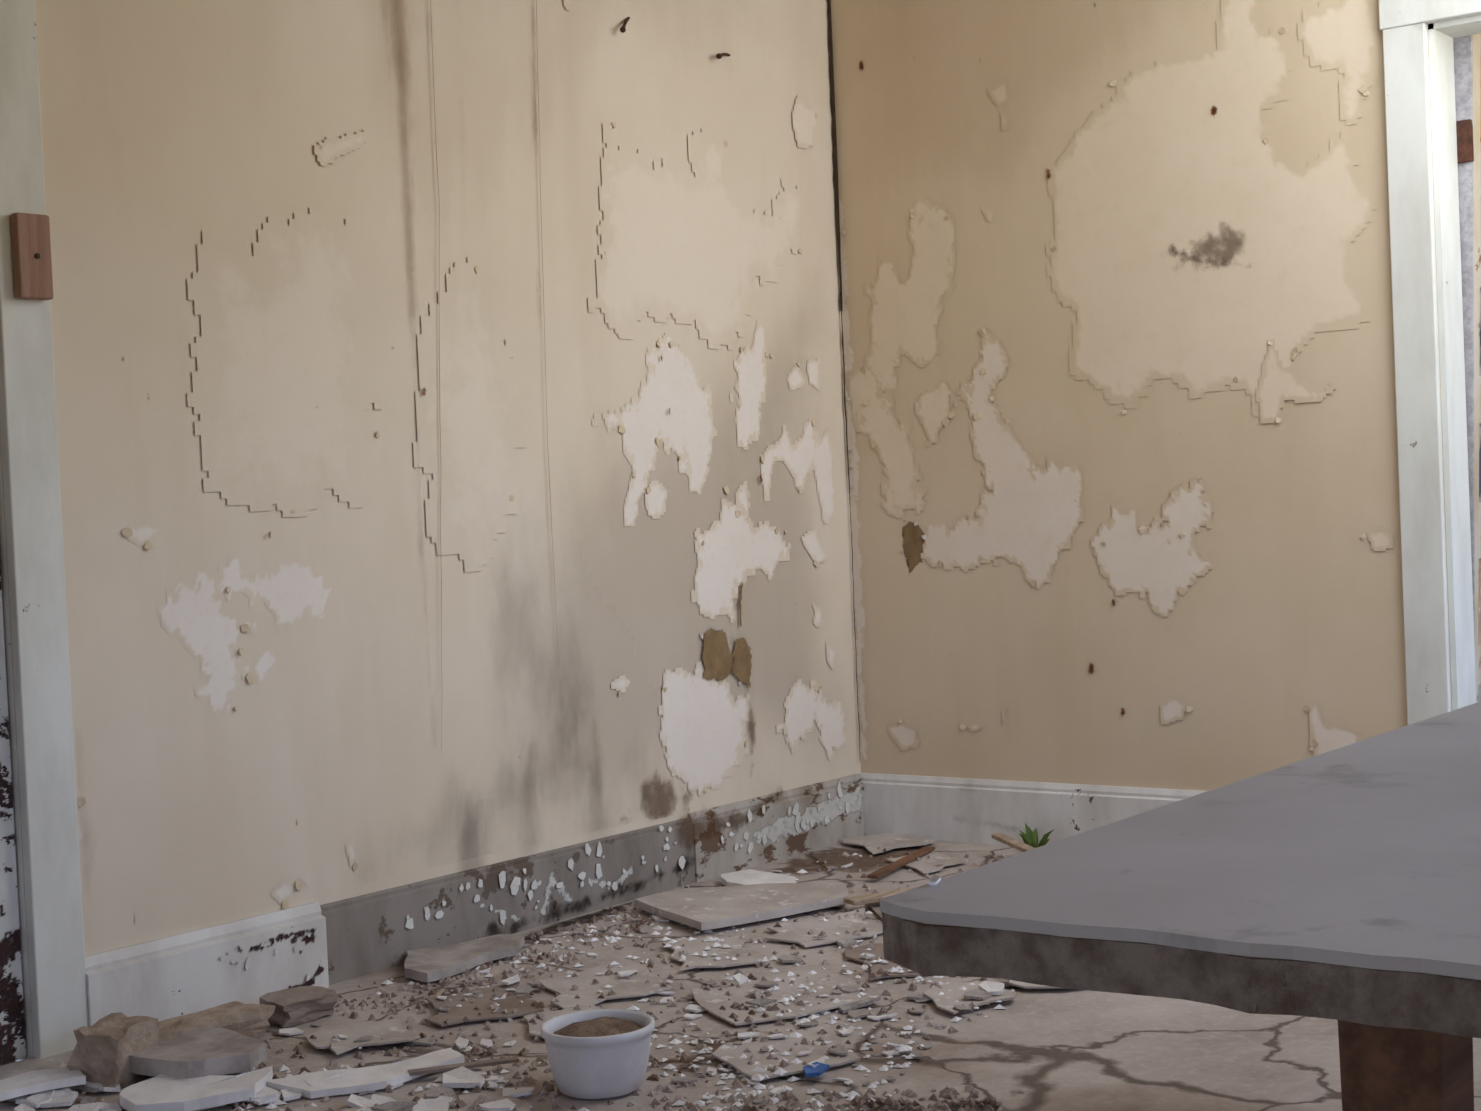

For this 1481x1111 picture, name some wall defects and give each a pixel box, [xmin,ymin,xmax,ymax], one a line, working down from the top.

peeling [1046,0,1379,424]
peeling [846,198,1215,617]
peeling [157,554,339,717]
peeling [776,679,847,760]
peeling [1304,702,1361,756]
peeling [721,781,863,855]
peeling [405,825,686,929]